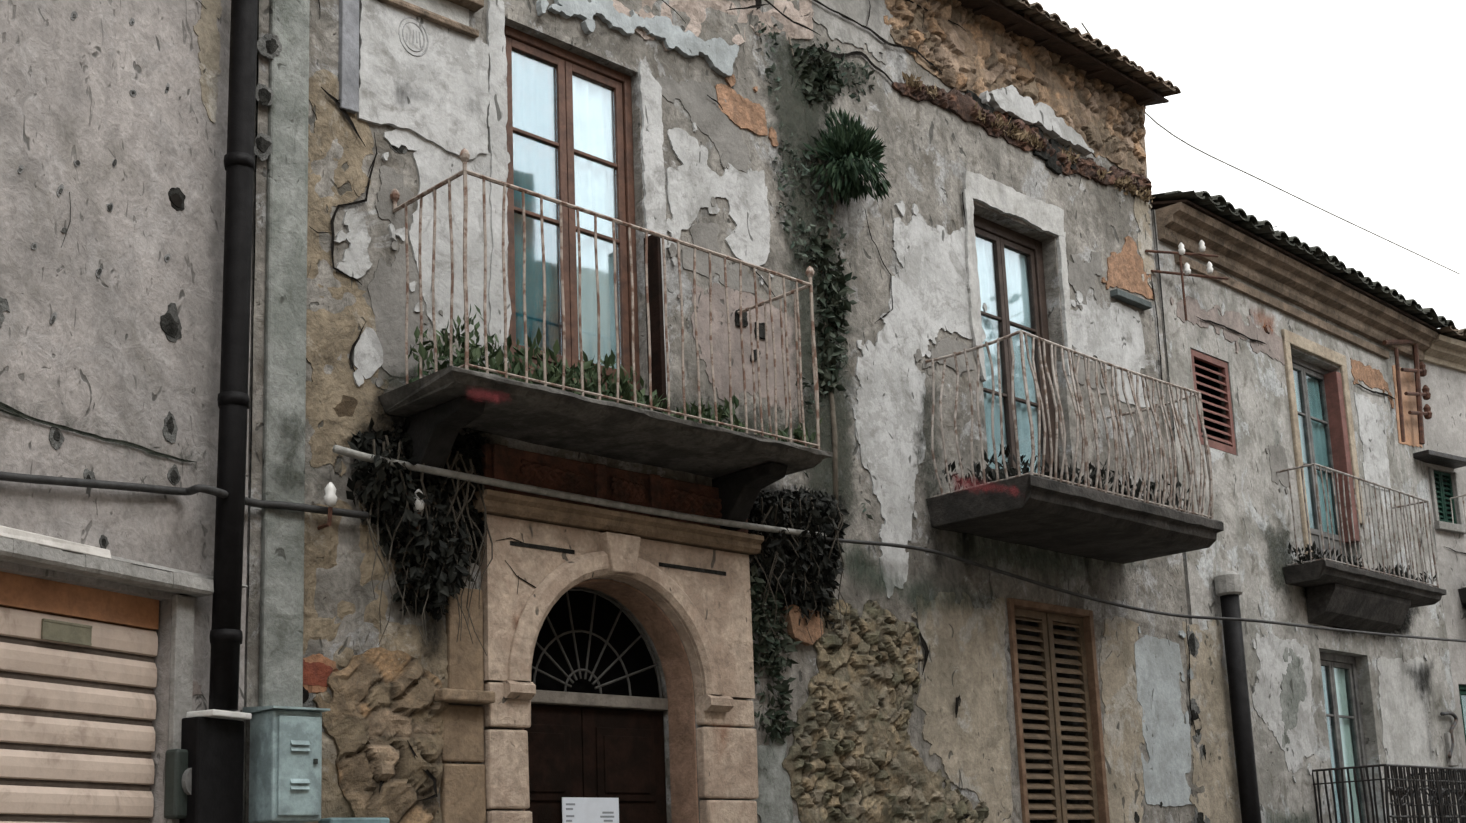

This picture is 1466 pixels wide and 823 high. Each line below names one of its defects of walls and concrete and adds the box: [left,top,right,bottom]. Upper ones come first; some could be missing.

peeling [536,0,893,147]
crack [726,0,1113,187]
spalling [891,80,1152,208]
spalling [0,297,10,325]
peeling [334,177,372,279]
peeling [333,327,384,417]
peeling [381,128,510,366]
peeling [1063,236,1174,407]
peeling [852,201,1013,823]
flaking render [783,604,824,646]
peeling [1099,616,1211,823]